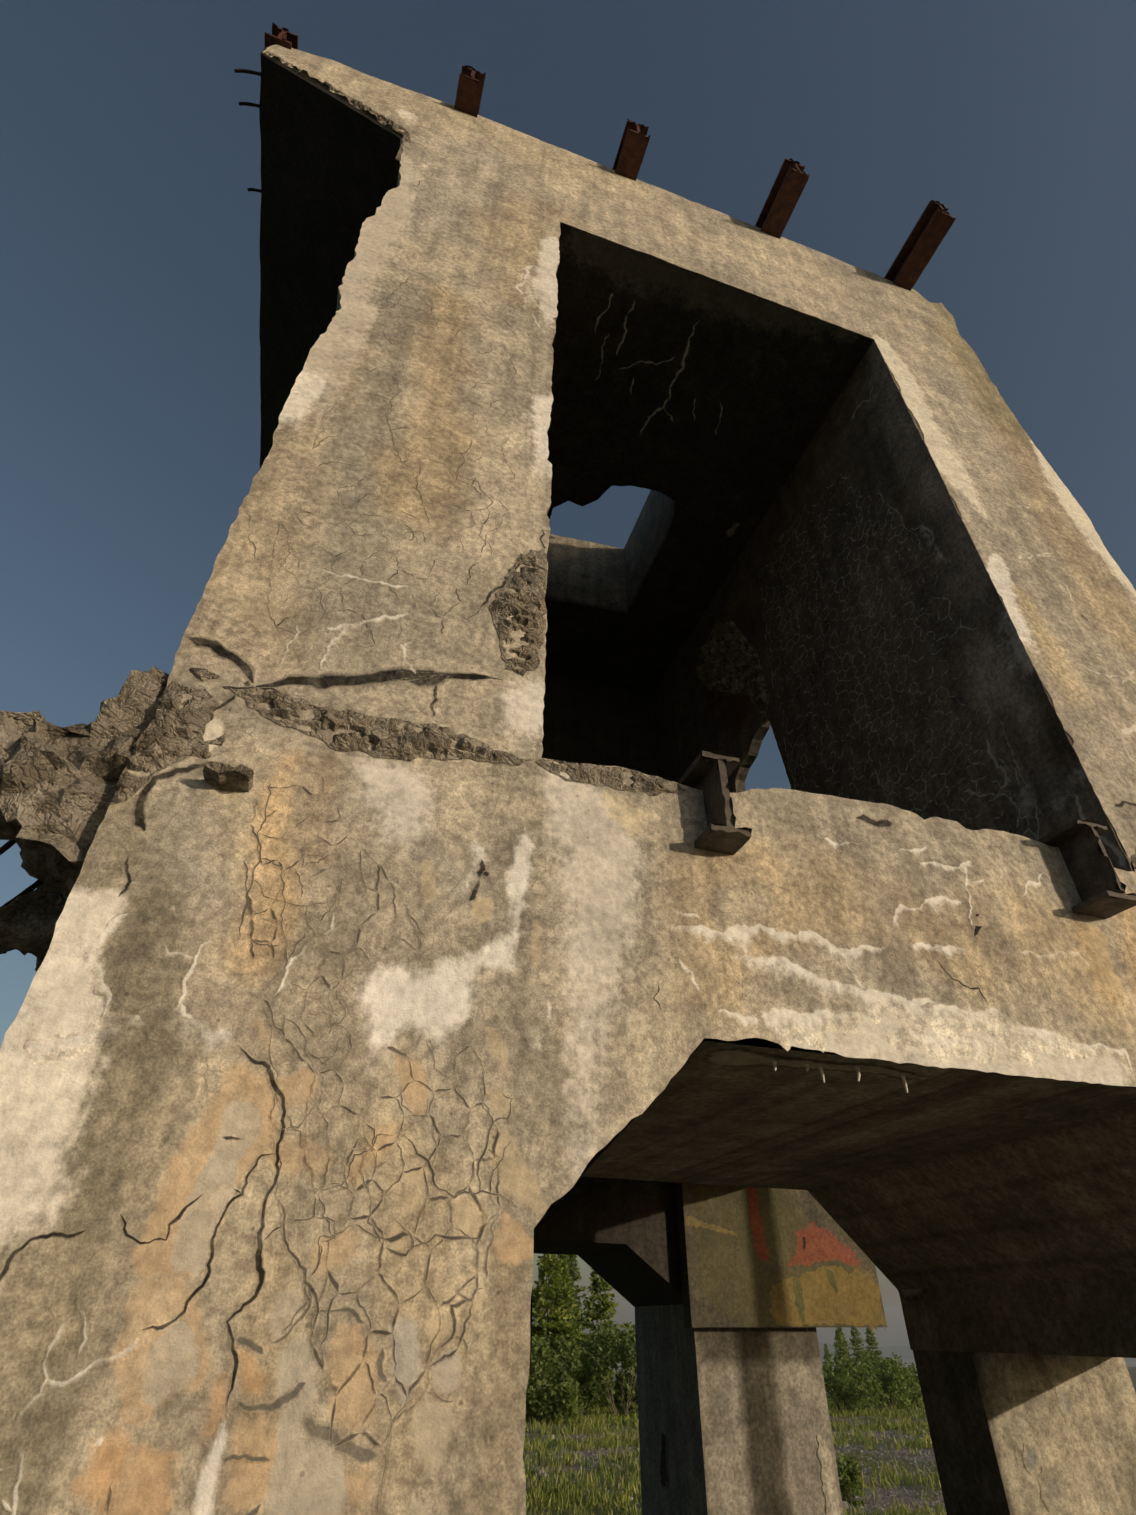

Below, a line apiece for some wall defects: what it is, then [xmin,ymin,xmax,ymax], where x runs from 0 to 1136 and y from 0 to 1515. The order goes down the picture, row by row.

crack [184,265,547,718]
spalling [489,548,548,676]
spalling [1,880,44,907]
damp [332,671,673,1203]
damp [702,919,1136,1087]
crack [0,759,522,1515]
damp [506,1202,541,1232]